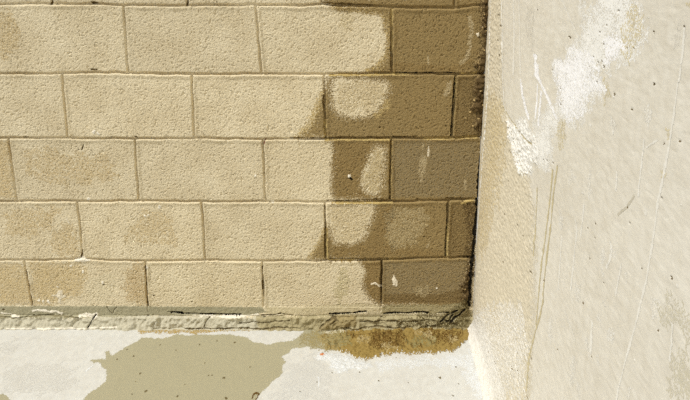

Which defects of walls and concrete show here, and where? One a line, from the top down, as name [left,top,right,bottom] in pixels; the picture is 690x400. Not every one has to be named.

water stain [619,4,644,67]
crack [320,136,480,331]
water stain [293,0,530,400]